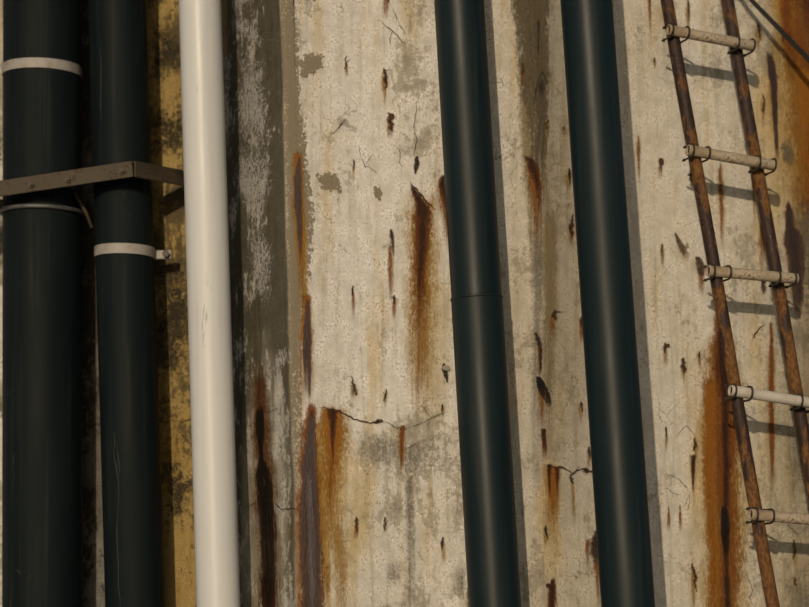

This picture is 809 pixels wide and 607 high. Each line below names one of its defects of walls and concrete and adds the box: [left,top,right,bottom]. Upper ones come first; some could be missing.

damp [155,108,183,154]
damp [158,263,188,377]
damp [231,0,272,217]
damp [251,367,280,607]
rust [292,153,312,393]
rust [296,404,348,607]
crack [319,407,446,429]
rust [406,175,447,376]
damp [511,0,550,368]
crack [545,464,592,474]
rust [690,317,744,607]
rust [762,0,809,306]